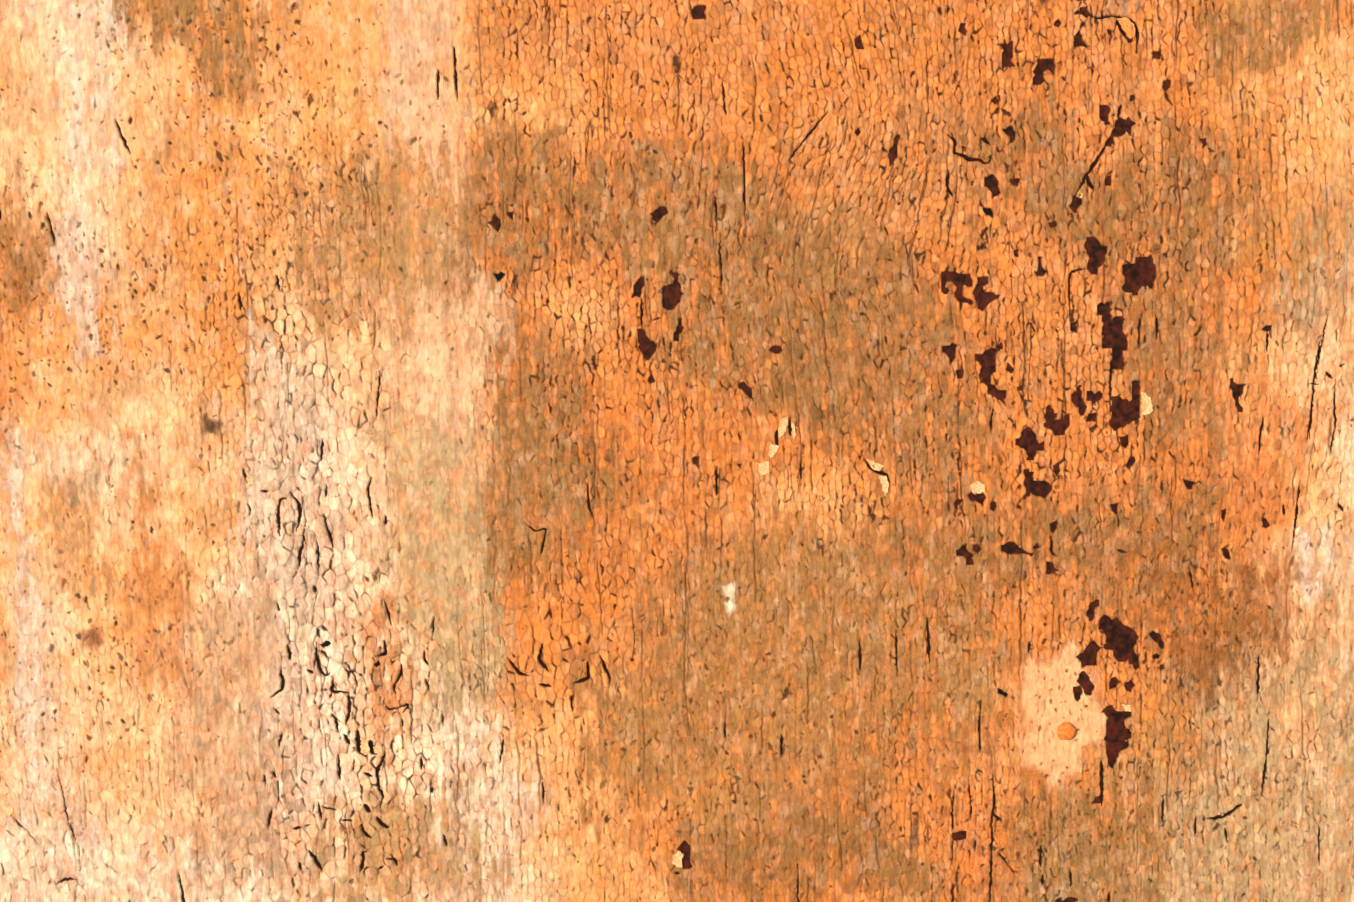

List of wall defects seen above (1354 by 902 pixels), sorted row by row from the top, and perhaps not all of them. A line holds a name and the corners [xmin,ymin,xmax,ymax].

crack [1073,106,1122,198]
peeling [941,272,1000,311]
peeling [942,343,1023,406]
peeling [1016,302,1153,499]
rust [127,451,197,700]
crack [243,439,333,593]
crack [367,477,387,524]
rust [556,425,668,574]
crack [264,599,444,871]
rust [366,594,409,739]
rust [946,705,1023,902]
peeling [998,600,1164,792]